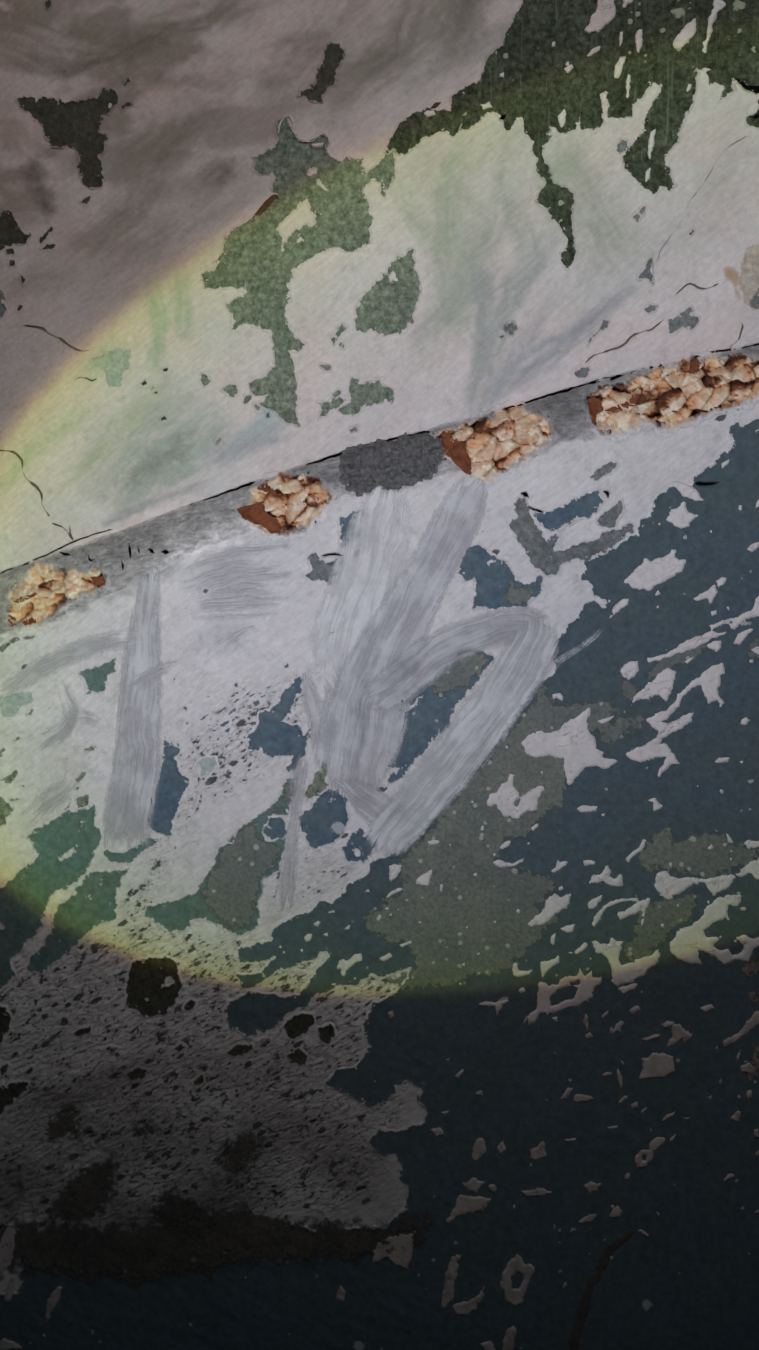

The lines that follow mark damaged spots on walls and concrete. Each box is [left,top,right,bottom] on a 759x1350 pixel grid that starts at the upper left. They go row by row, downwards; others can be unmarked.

peeling [199,0,759,587]
peeling [0,317,759,1350]